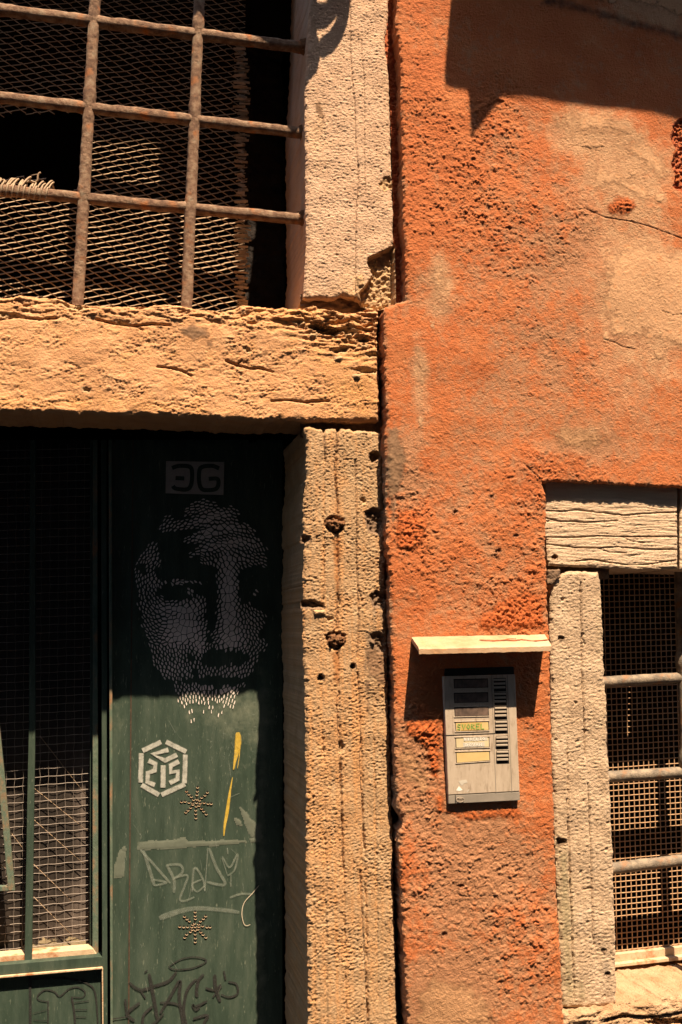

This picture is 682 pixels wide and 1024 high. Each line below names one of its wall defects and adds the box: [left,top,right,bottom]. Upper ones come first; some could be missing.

spalling [356,0,402,311]
peeling [556,112,682,202]
spalling [0,311,25,320]
spalling [292,318,378,380]